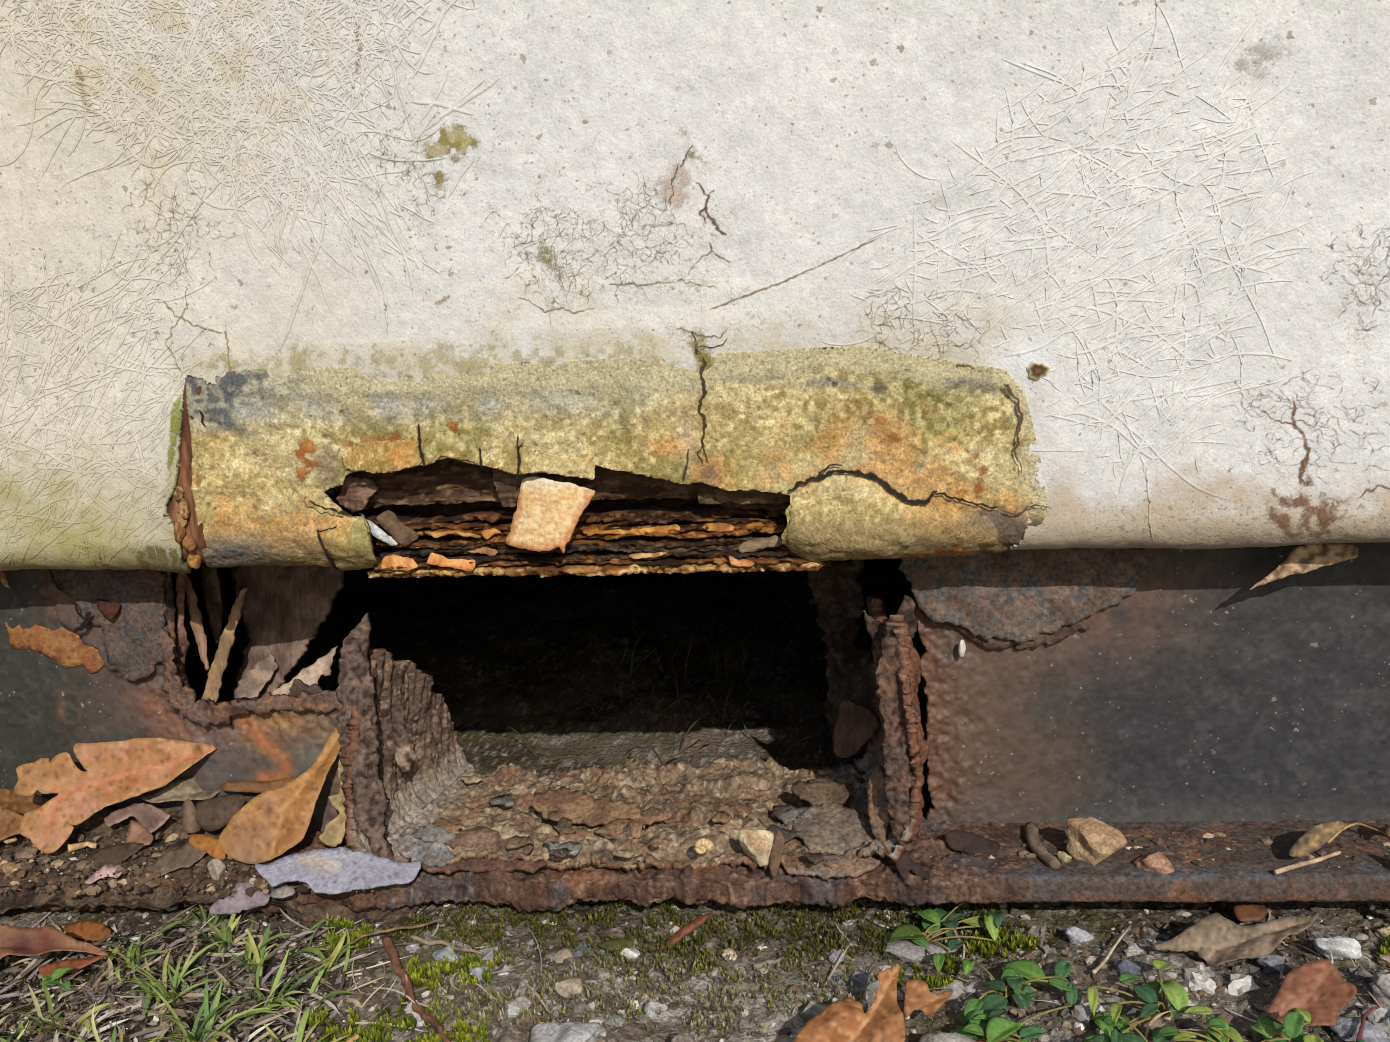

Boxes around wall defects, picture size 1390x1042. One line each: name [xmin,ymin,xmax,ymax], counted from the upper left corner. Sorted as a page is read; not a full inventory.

crack [502,145,880,481]
damp [208,347,322,373]
damp [421,345,586,374]
crack [859,281,1024,473]
peeling [303,492,476,572]
peeling [519,447,596,479]
peeling [729,556,754,567]
crack [787,463,1051,515]
corrosion [1270,476,1339,538]
corrosion [335,612,659,875]
corrosion [767,559,918,881]